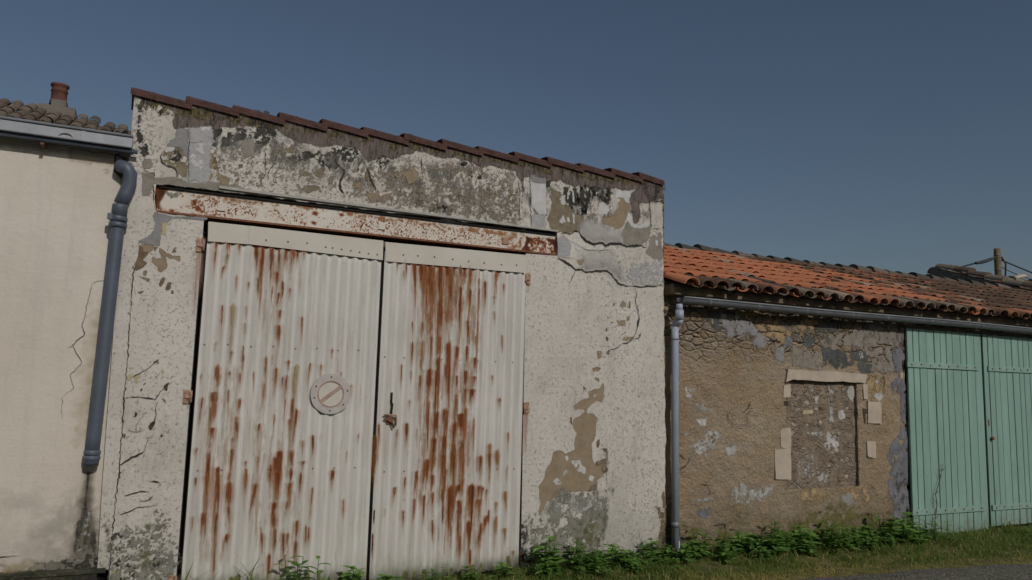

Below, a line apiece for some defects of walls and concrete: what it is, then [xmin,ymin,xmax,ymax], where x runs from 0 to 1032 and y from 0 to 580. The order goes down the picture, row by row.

damp [5,473,98,573]
crack [61,280,104,411]
crack [108,265,164,580]
peeling [135,244,180,294]
rust [192,357,322,574]
rust [236,245,305,341]
rust [155,188,557,254]
peeling [142,126,584,234]
rust [393,262,509,569]
peeling [538,293,634,515]
crack [558,201,662,350]
peeling [597,189,664,261]